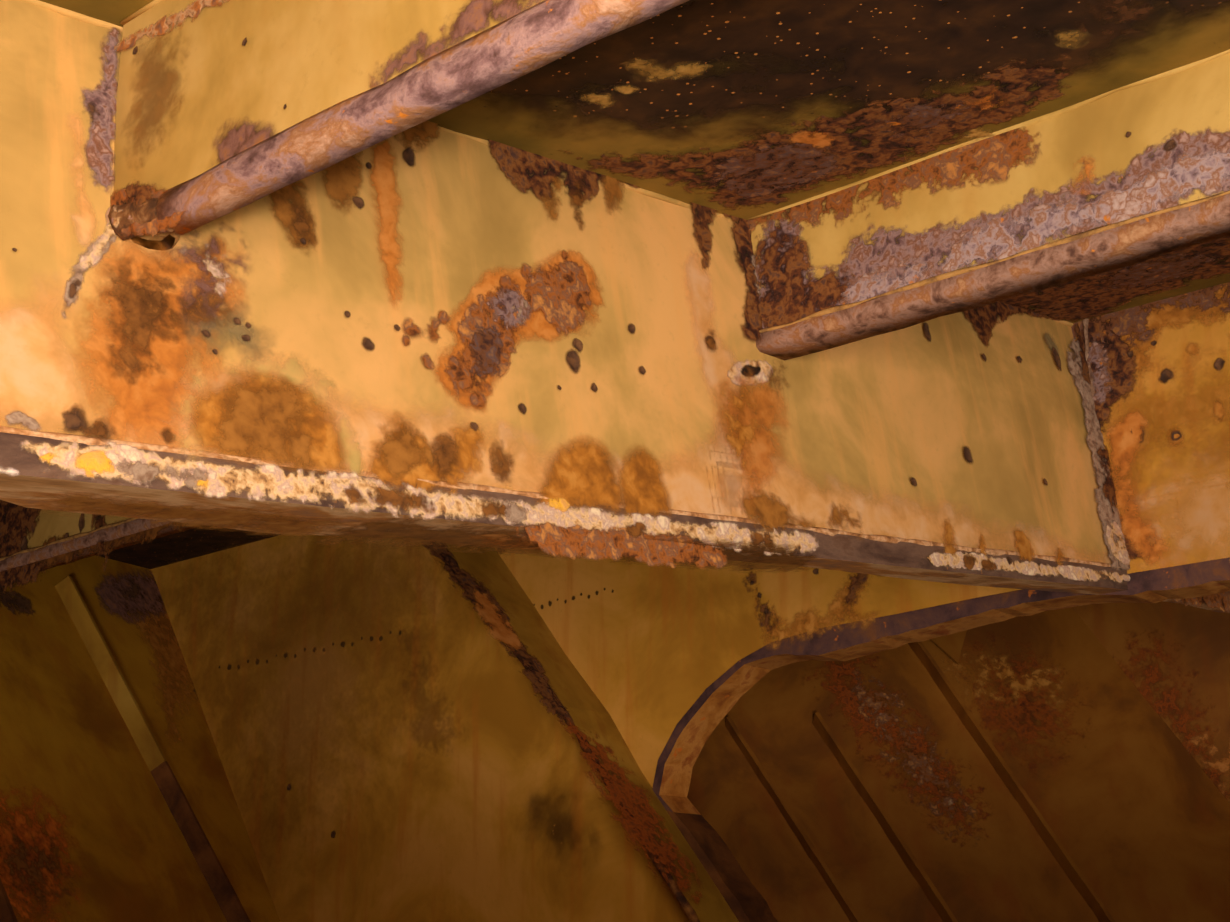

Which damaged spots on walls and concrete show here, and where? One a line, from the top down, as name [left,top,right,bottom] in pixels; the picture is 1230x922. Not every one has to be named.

rust [370,0,541,88]
rust [63,0,513,494]
hole [403,147,415,166]
rust [488,54,1230,341]
hole [362,337,375,350]
peeling [6,411,818,555]
rust [402,251,602,410]
hole [566,338,583,373]
spalling [964,446,973,463]
rust [963,235,1230,571]
rust [0,370,875,786]
peeling [927,552,1130,583]